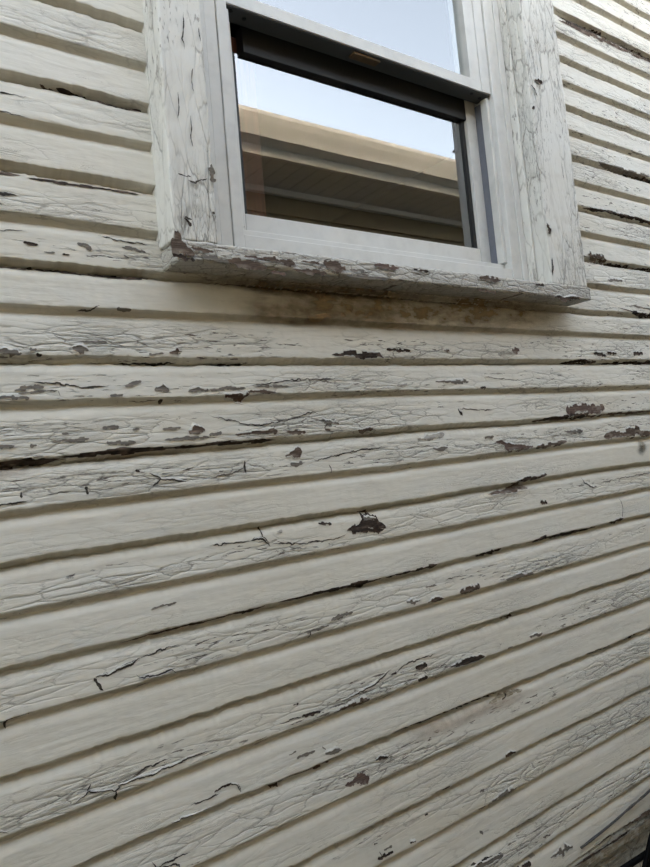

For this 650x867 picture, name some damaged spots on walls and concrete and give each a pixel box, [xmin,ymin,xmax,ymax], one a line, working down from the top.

peeling [171,231,399,280]
crack [119,360,174,368]
crack [211,361,244,369]
peeling [0,380,142,400]
peeling [188,378,330,405]
peeling [208,412,388,467]
peeling [485,401,605,455]
crack [0,492,26,506]
peeling [347,509,386,534]
crack [210,527,345,546]
crack [94,645,176,691]
crack [76,749,212,803]